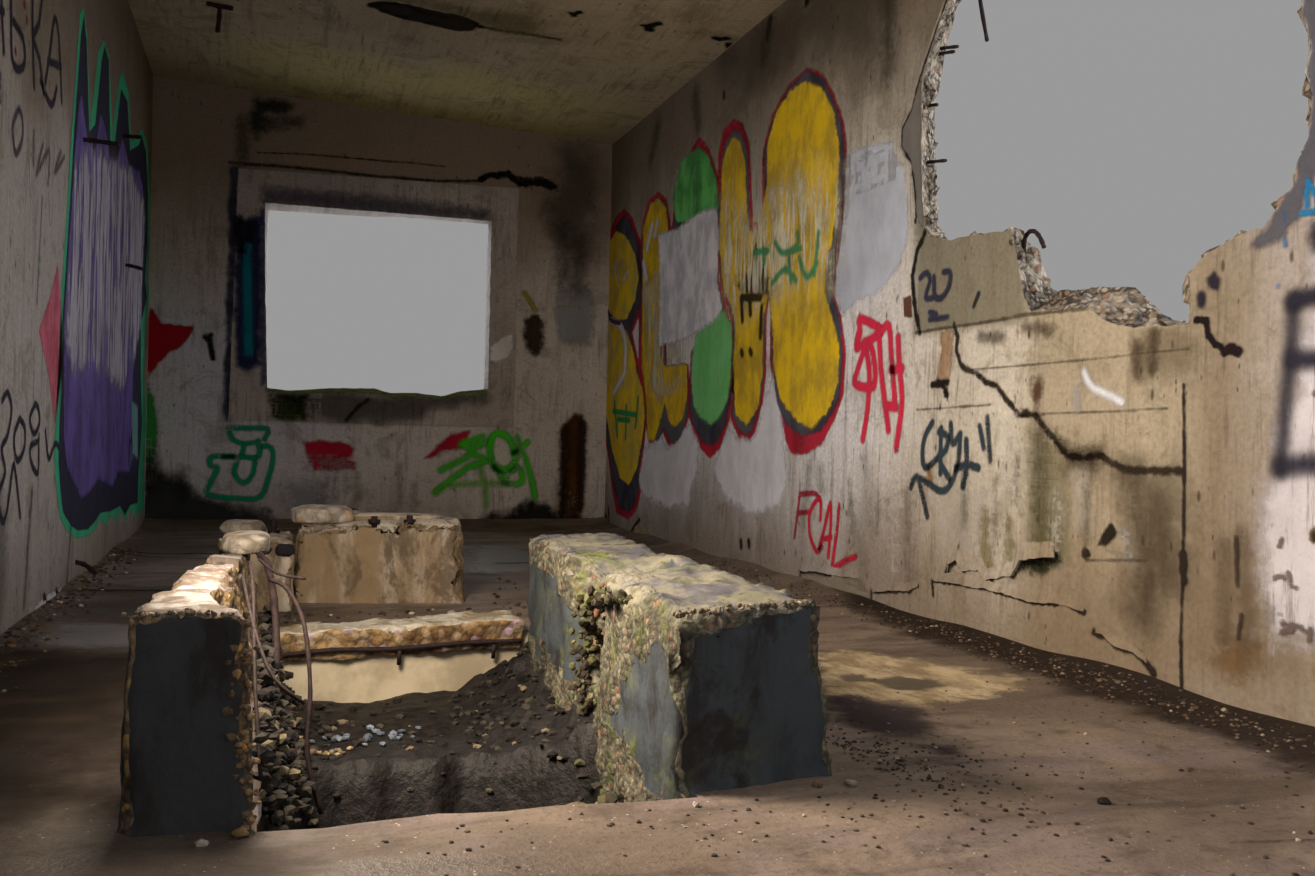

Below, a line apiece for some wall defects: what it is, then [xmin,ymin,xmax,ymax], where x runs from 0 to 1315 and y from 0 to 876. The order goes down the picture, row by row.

flaking render [893,0,947,336]
spalling [1253,0,1315,247]
spalling [930,330,954,398]
crack [1169,316,1242,358]
crack [915,308,1187,688]
crack [1234,536,1243,640]